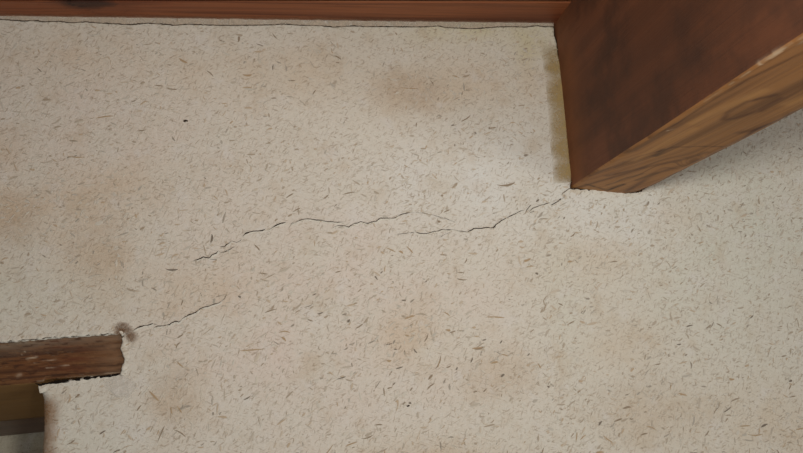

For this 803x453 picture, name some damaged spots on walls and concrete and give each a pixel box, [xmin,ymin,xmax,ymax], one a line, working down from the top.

crack [193,188,571,262]
crack [134,294,227,332]